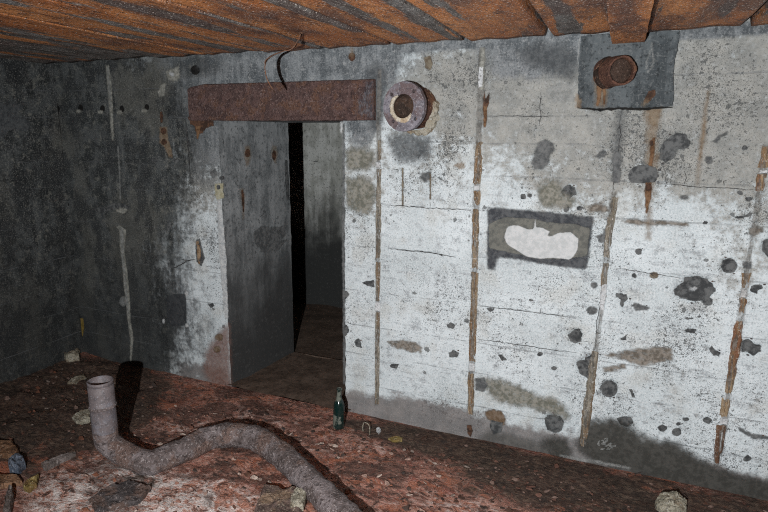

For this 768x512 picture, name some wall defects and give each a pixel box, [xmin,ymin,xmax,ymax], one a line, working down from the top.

water stain [106,65,114,140]
water stain [158,67,180,96]
rust [593,56,615,106]
water stain [215,183,228,318]
water stain [117,226,133,361]
spalling [674,276,715,306]
water stain [482,419,768,501]